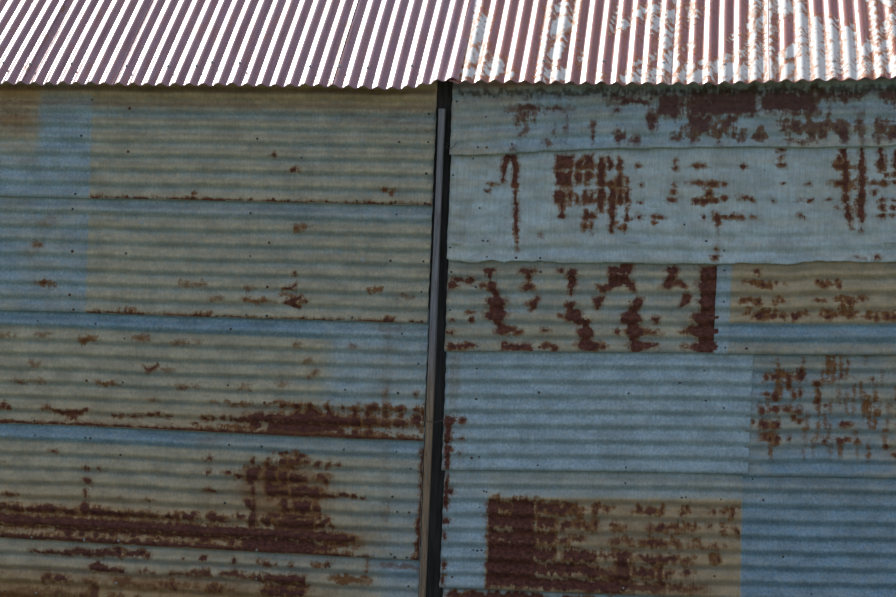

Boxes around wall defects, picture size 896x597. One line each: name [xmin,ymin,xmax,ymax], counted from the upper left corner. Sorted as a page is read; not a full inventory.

peeling [458,0,519,81]
peeling [532,0,586,84]
peeling [594,0,896,85]
corrosion [487,104,575,247]
corrosion [554,154,663,233]
corrosion [607,90,896,232]
corrosion [446,267,558,352]
corrosion [592,263,660,352]
corrosion [662,248,719,353]
corrosion [0,451,369,597]
corrosion [0,400,424,560]
corrosion [440,495,740,597]